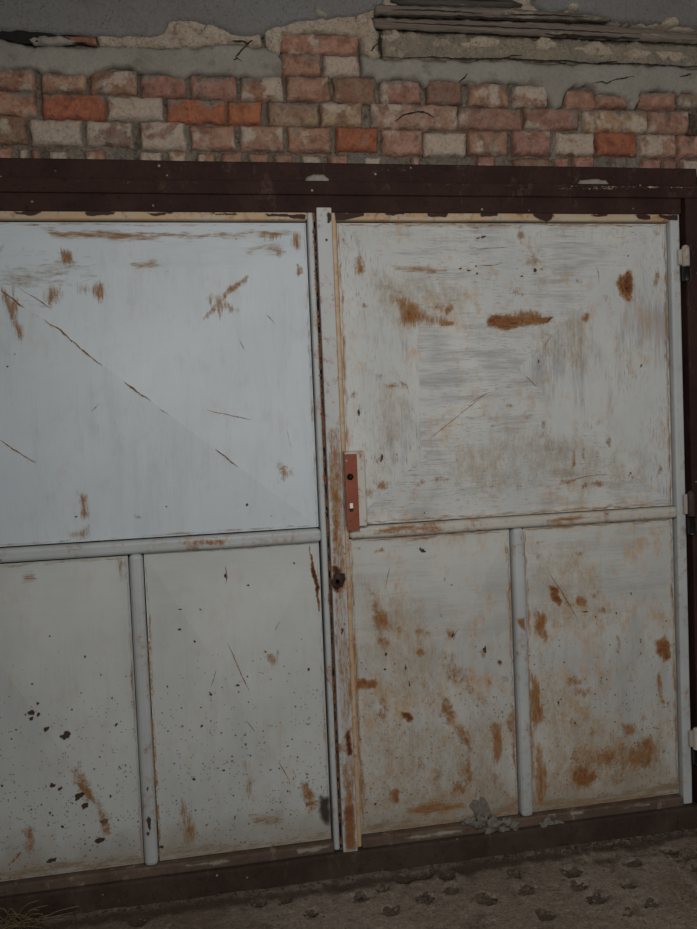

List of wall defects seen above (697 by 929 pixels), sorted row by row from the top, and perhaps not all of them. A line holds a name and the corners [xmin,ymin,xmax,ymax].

flaking render [0,0,697,70]